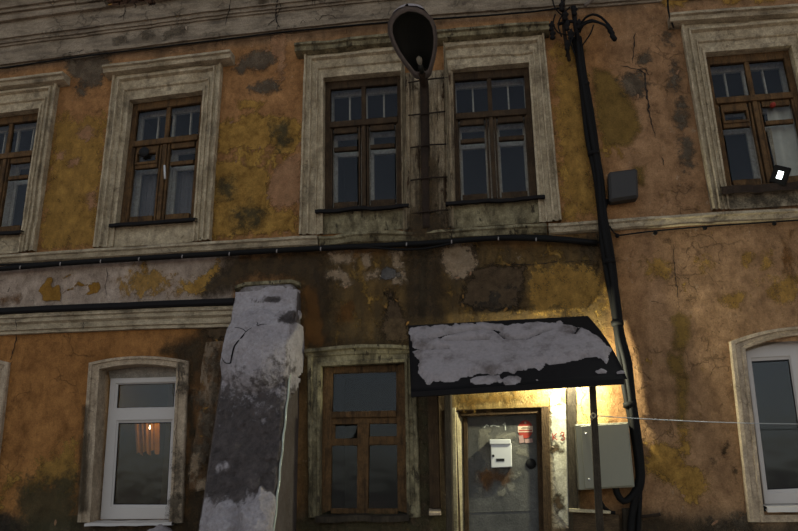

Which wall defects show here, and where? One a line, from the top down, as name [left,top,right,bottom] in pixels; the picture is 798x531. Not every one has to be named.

crack [268,0,282,28]
crack [623,32,655,134]
peeling [39,259,221,301]
leakage [0,406,88,531]